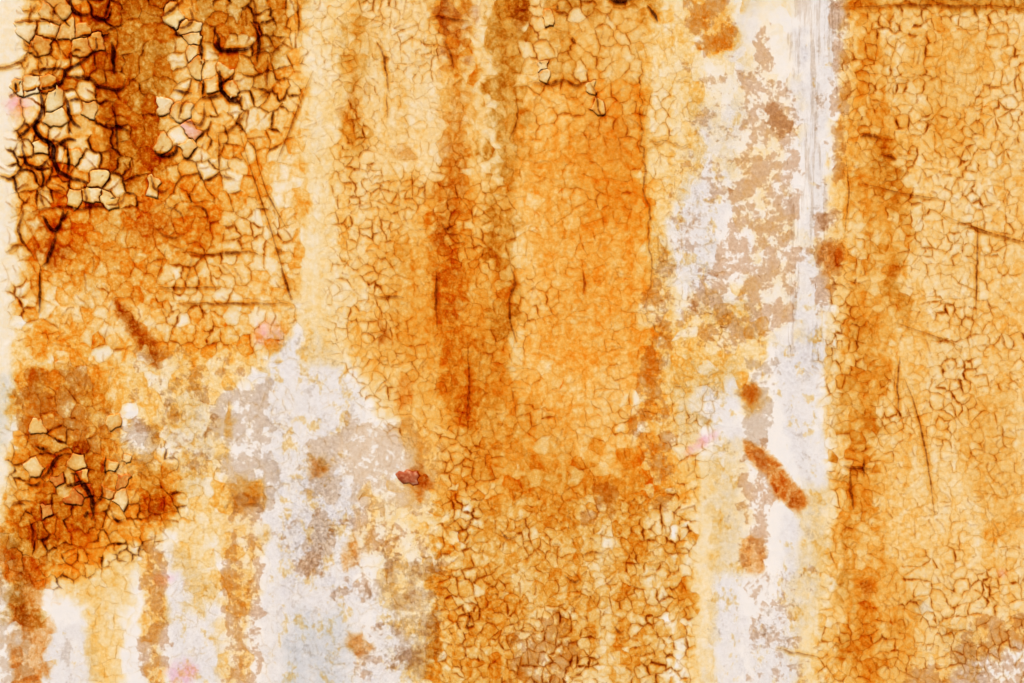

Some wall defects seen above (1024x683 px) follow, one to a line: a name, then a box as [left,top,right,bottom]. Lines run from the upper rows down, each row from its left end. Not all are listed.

corrosion [80,0,176,175]
spalling [118,303,156,348]
crack [0,0,302,347]
crack [335,104,514,399]
corrosion [469,0,530,111]
crack [513,0,658,143]
crack [842,0,1024,461]
corrosion [73,445,104,493]
crack [8,387,186,588]
peeling [395,469,420,486]
crack [425,279,698,683]
spalling [746,448,805,505]